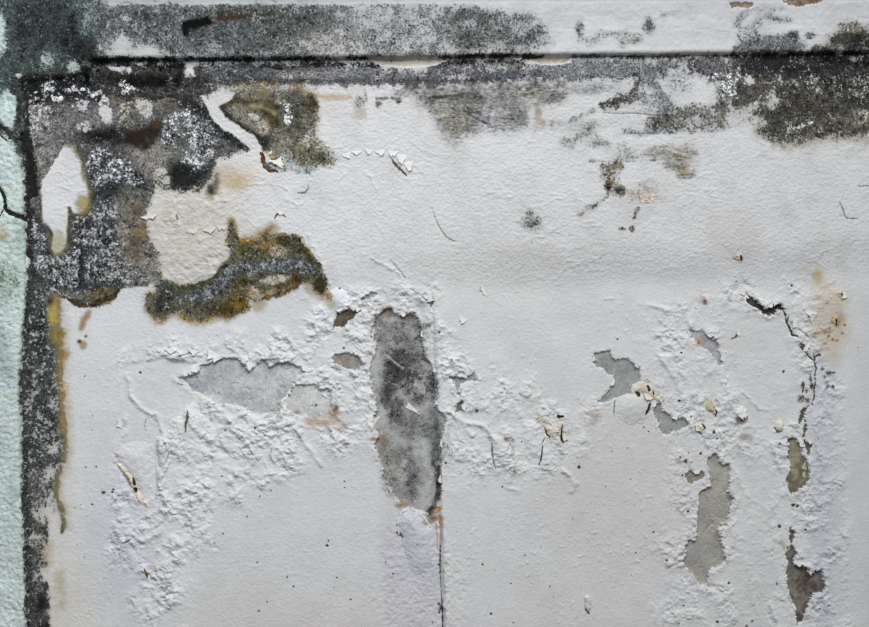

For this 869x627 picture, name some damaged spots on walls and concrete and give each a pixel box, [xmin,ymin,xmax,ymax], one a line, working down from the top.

leakage [729,9,809,58]
leakage [624,21,869,147]
crack [0,186,28,222]
peeling [156,347,332,420]
leakage [0,0,656,627]
peeling [332,309,446,516]
peeling [592,350,706,435]
peeling [783,406,813,495]
crack [782,310,819,405]
peeling [682,452,738,586]
crack [437,545,445,627]
peeling [784,525,829,624]